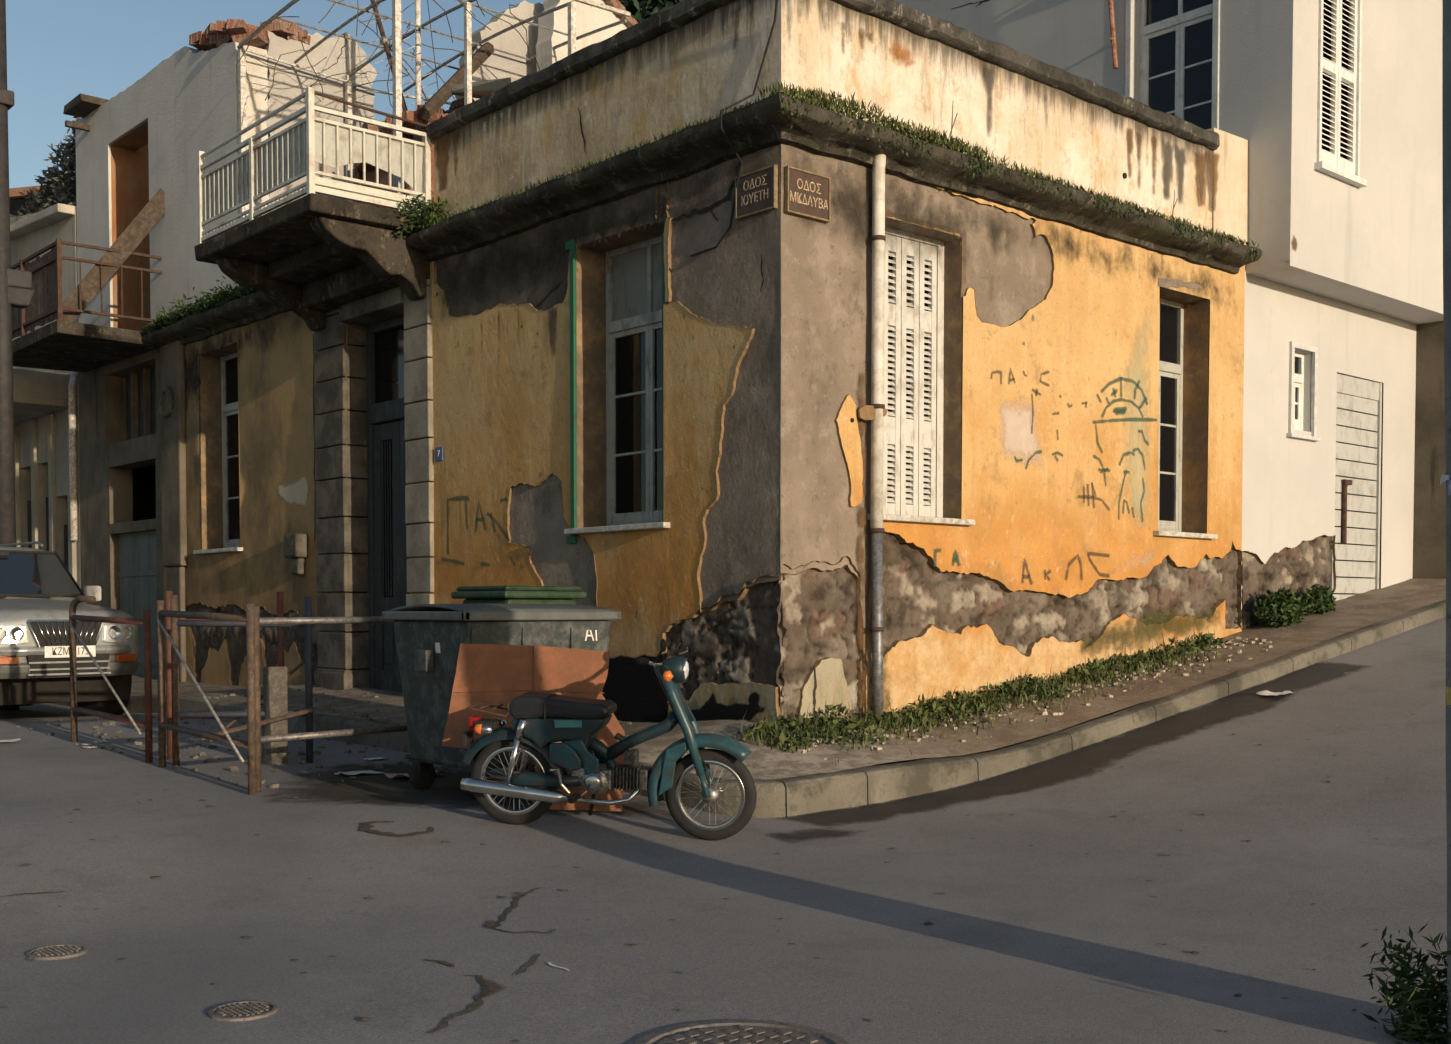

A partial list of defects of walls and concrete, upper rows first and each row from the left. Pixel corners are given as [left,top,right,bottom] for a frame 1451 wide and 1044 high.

damp [985,67,994,130]
damp [1163,142,1186,202]
peeling [434,144,1336,725]